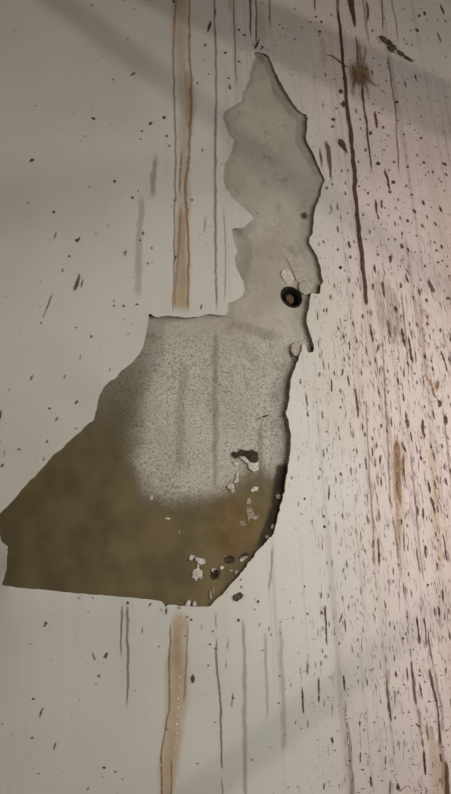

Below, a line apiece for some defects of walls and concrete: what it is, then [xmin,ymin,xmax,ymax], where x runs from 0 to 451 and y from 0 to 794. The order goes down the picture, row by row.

corrosion [329,55,369,85]
damp [319,0,442,305]
damp [0,394,284,699]
peeling [100,52,325,607]
damp [318,320,381,499]
damp [394,306,450,387]
damp [400,519,448,572]
damp [414,420,451,522]
corrosion [160,627,171,794]